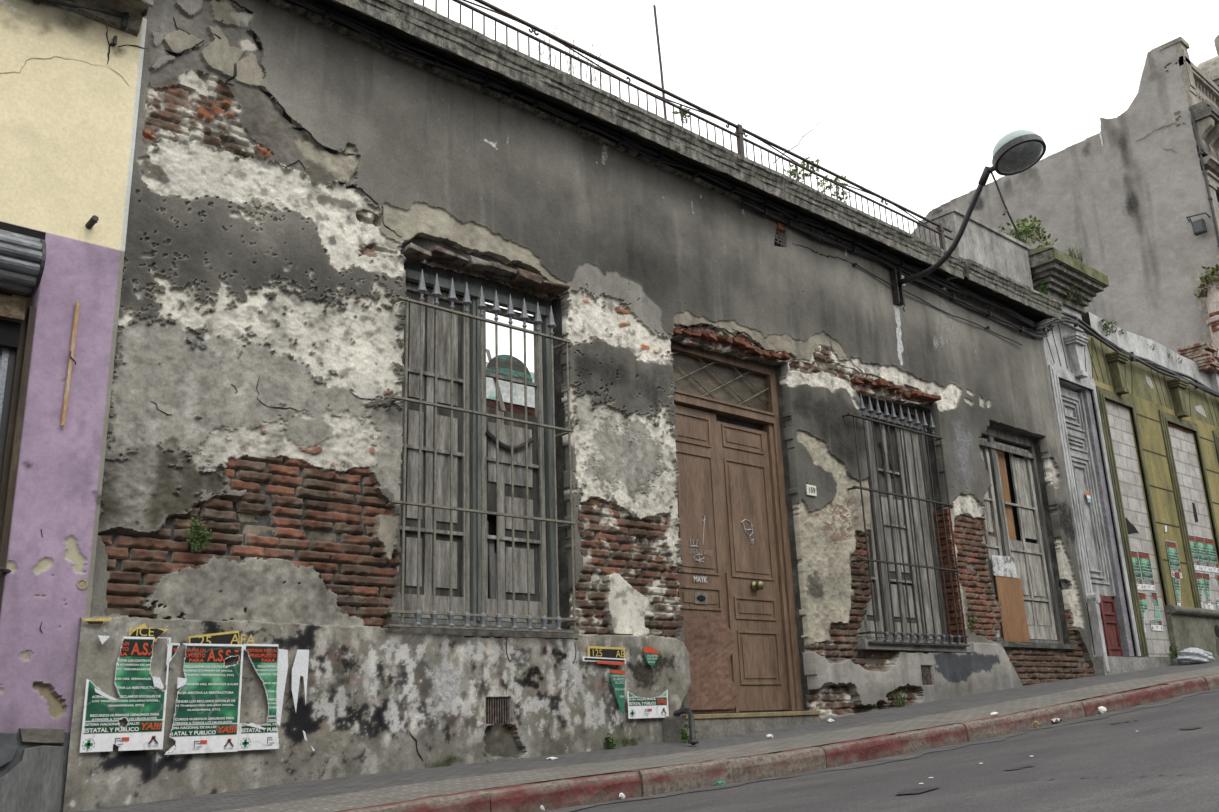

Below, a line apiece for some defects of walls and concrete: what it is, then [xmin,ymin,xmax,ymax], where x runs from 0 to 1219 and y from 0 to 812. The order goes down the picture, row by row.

crack [0,0,402,237]
water stain [1127,192,1138,213]
flaking render [98,0,994,780]
peeling [34,535,88,576]
flaking render [934,487,1095,685]
spalling [33,681,67,719]